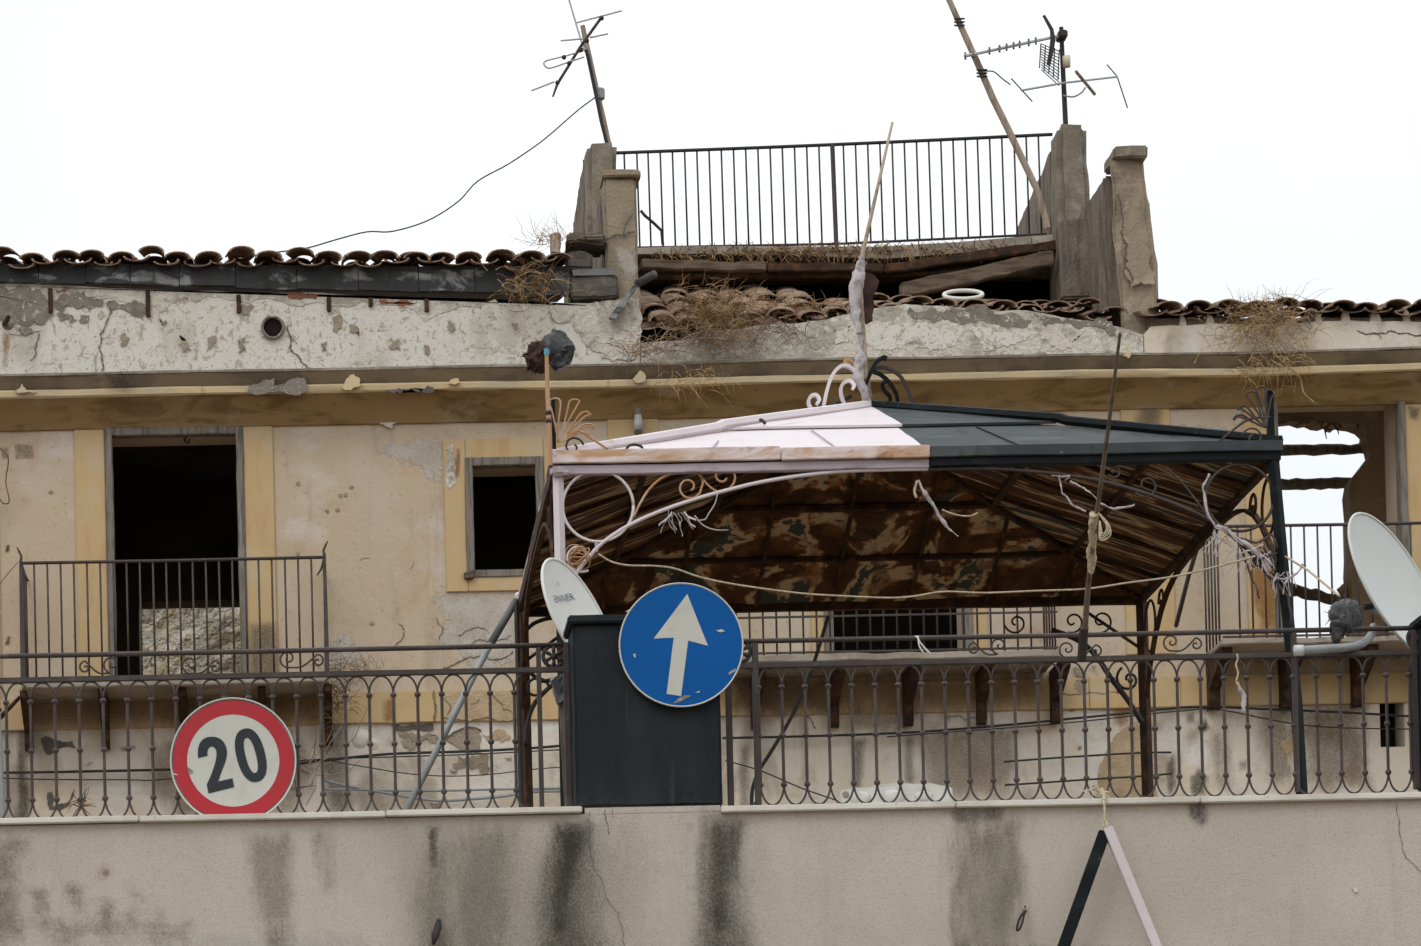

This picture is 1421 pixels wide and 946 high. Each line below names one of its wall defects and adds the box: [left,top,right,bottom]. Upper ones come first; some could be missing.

peeling [0,285,167,336]
peeling [180,335,217,352]
peeling [287,291,318,300]
peeling [321,315,360,351]
peeling [549,297,646,384]
peeling [866,304,1116,351]
spalling [248,377,307,396]
peeling [391,690,517,774]
leakage [553,826,587,946]